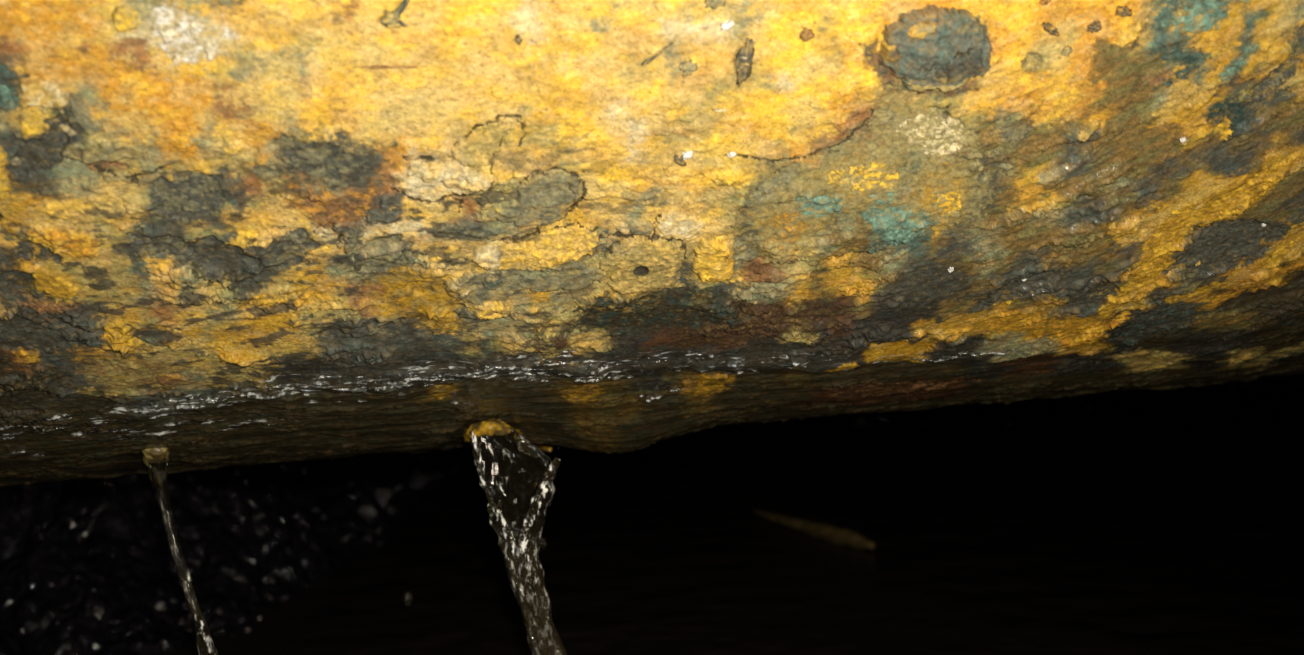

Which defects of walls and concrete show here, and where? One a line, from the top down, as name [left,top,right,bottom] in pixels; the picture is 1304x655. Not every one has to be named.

corrosion [859,43,979,100]
corrosion [284,184,378,227]
corrosion [11,347,40,363]
water stain [91,374,325,438]
corrosion [365,262,465,332]
water stain [339,350,630,392]
corrosion [679,372,735,397]
corrosion [672,294,847,348]
corrosion [826,362,857,373]
corrosion [883,340,936,356]
corrosion [973,163,1274,350]
corrosion [1163,232,1304,311]